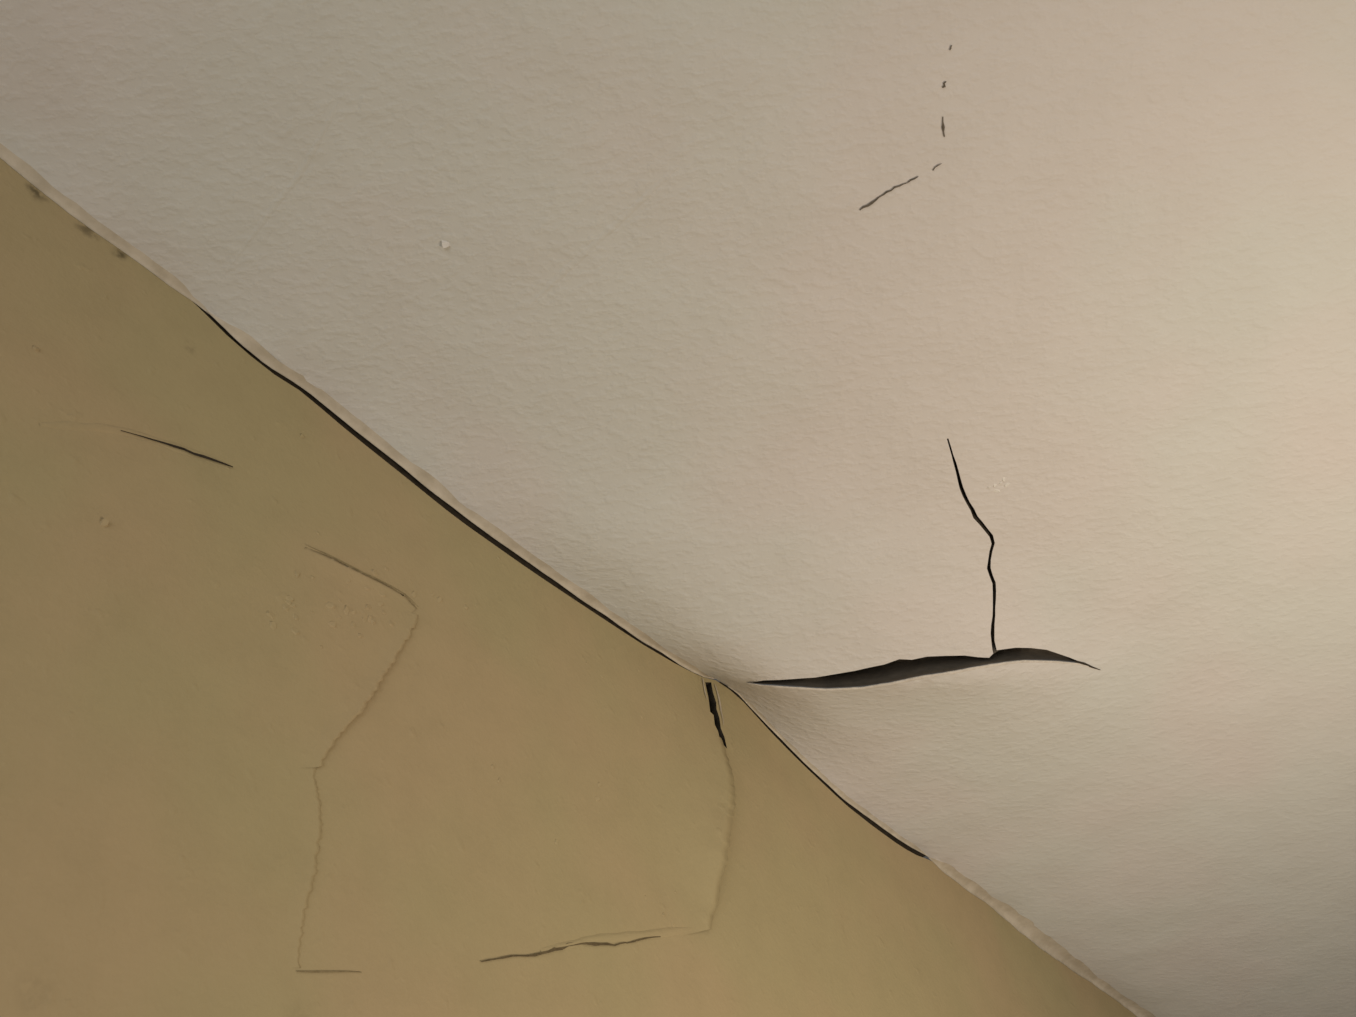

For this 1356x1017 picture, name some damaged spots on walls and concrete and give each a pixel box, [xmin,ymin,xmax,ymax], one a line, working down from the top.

crack [39,421,233,469]
crack [192,301,925,857]
crack [947,439,998,656]